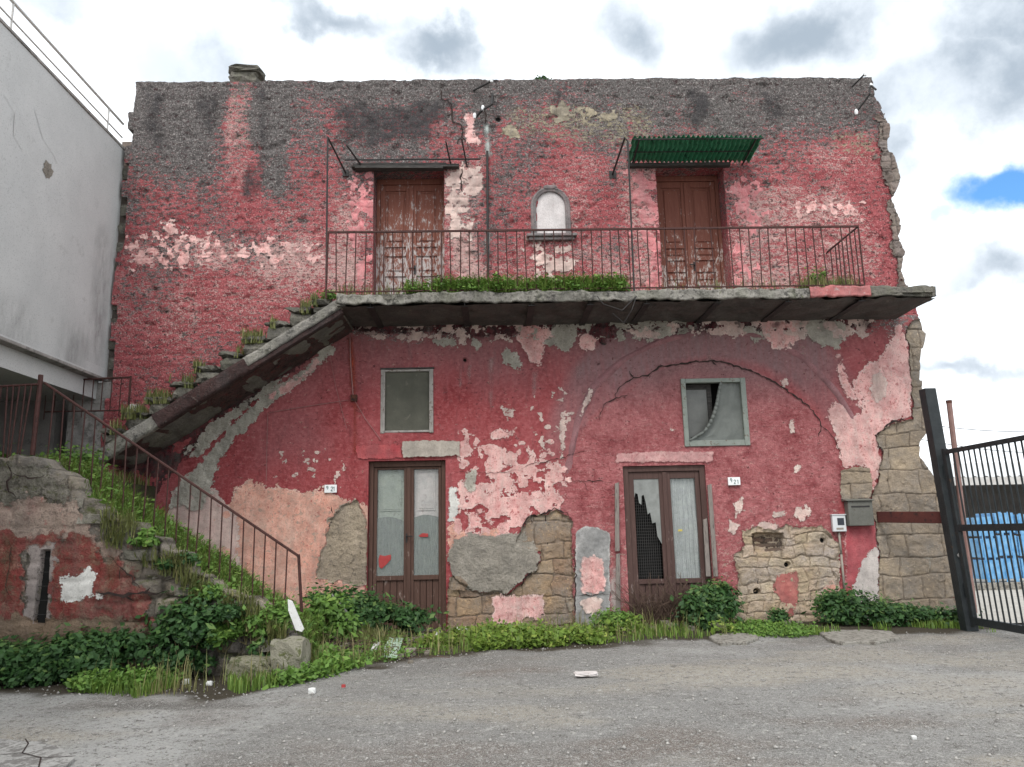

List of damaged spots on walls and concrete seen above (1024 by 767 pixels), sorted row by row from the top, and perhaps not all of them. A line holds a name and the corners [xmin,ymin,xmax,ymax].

crack [440,84,487,193]
flaking render [550,100,618,126]
peeling [124,219,325,272]
flaking render [445,162,484,242]
crack [599,360,842,456]
peeling [115,343,368,608]
spalling [352,318,956,631]
peeling [0,491,155,677]